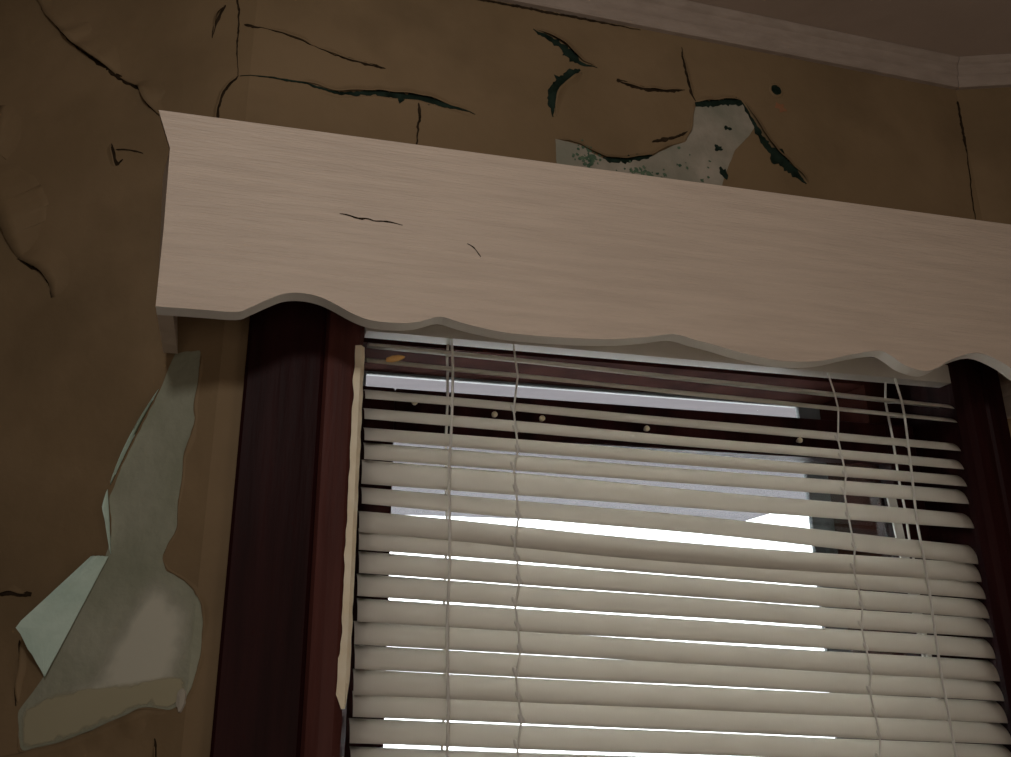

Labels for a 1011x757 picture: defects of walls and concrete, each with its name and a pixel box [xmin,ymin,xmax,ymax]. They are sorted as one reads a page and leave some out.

crack [212,0,474,145]
crack [681,47,696,101]
peeling [555,94,809,186]
crack [957,101,976,220]
peeling [4,351,210,757]